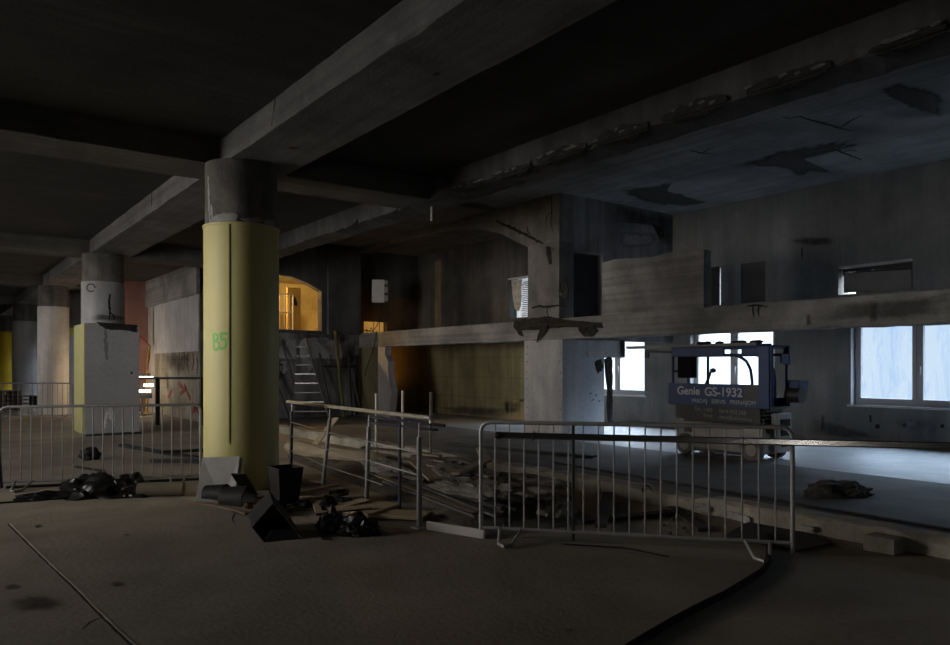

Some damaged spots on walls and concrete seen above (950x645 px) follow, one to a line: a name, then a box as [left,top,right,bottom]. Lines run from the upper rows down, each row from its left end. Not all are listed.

peeling [884,84,941,115]
crack [783,115,863,160]
peeling [750,142,857,175]
peeling [627,183,704,205]
crack [496,199,553,244]
crack [107,294,115,321]